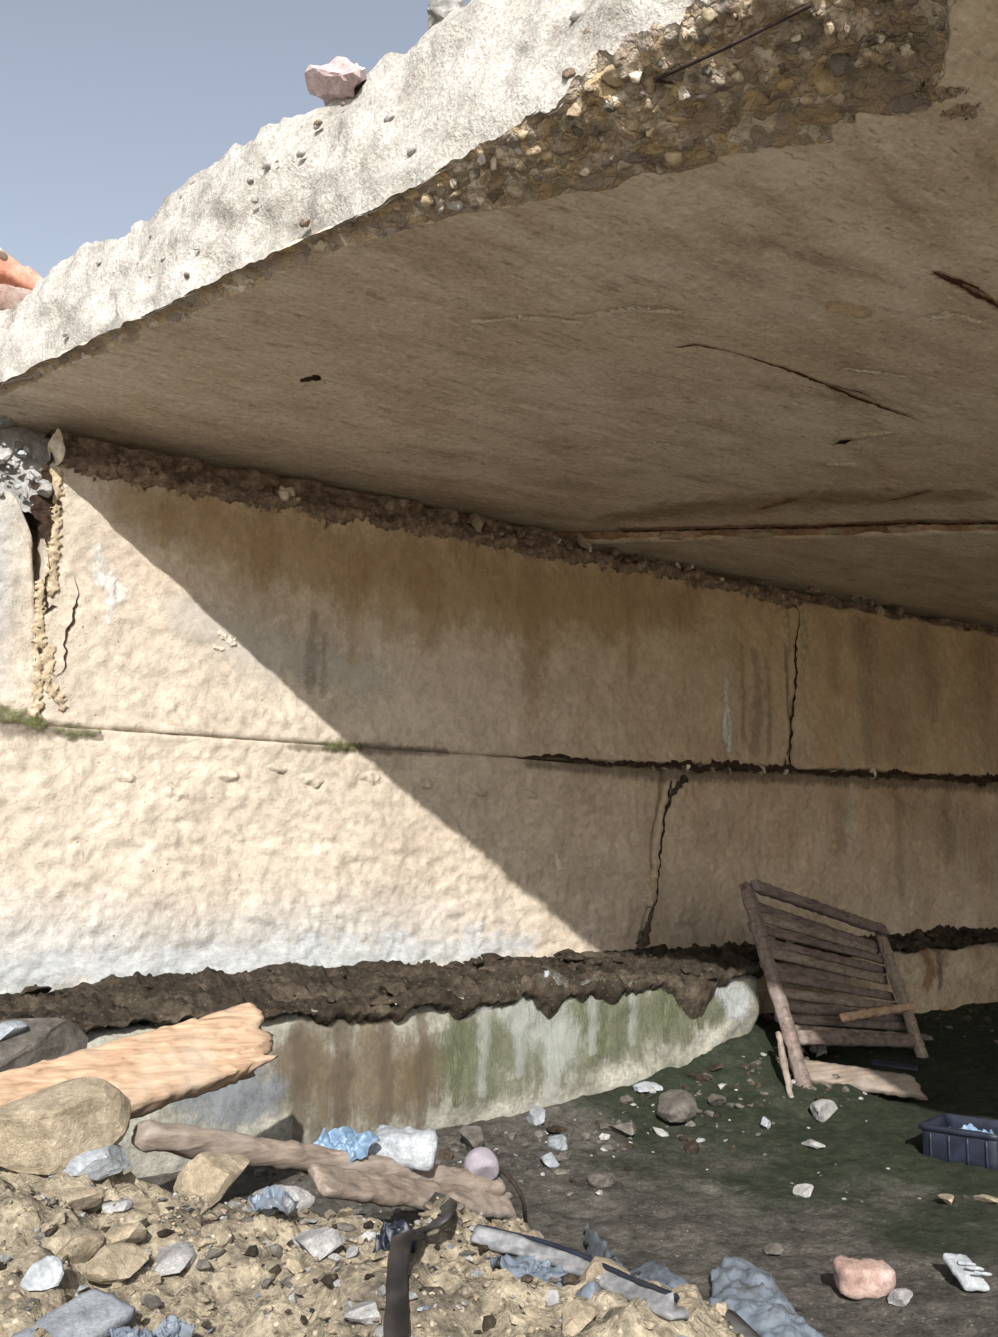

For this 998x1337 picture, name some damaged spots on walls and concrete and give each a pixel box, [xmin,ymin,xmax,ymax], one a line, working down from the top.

spalling [0,0,982,396]
crack [932,271,998,307]
crack [666,345,922,422]
crack [29,465,79,722]
water stain [91,543,127,624]
crack [780,599,810,765]
crack [635,774,688,947]
water stain [175,1019,464,1131]
water stain [499,999,579,1073]
water stain [596,999,606,1057]